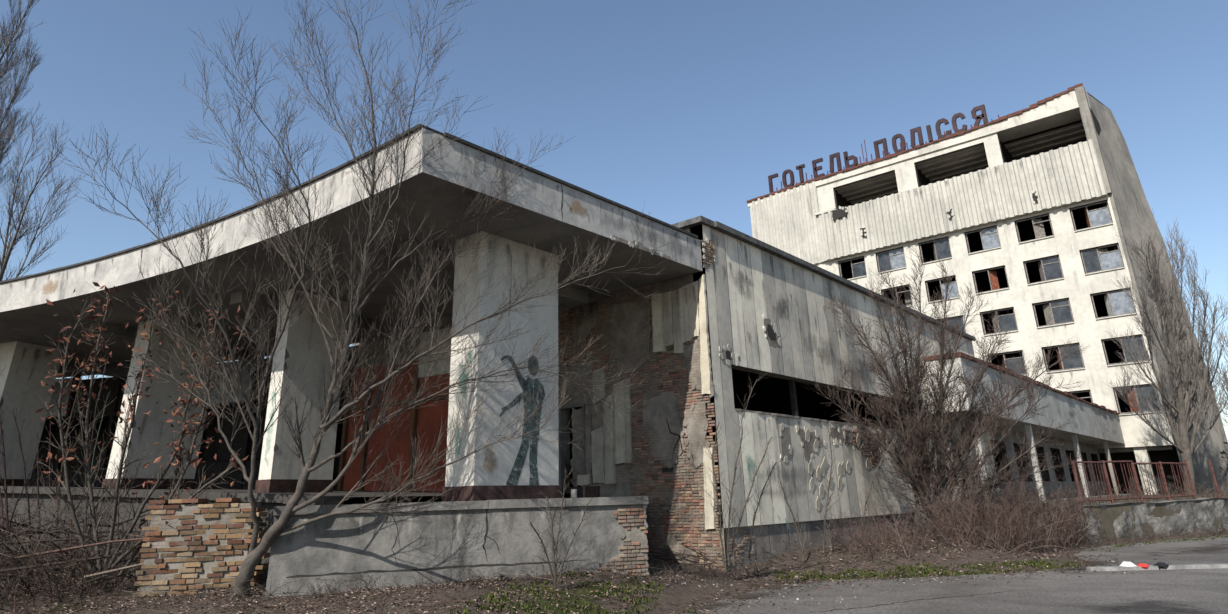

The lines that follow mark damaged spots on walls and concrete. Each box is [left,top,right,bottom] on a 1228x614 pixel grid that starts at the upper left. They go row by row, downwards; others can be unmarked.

spalling [558,286,757,577]